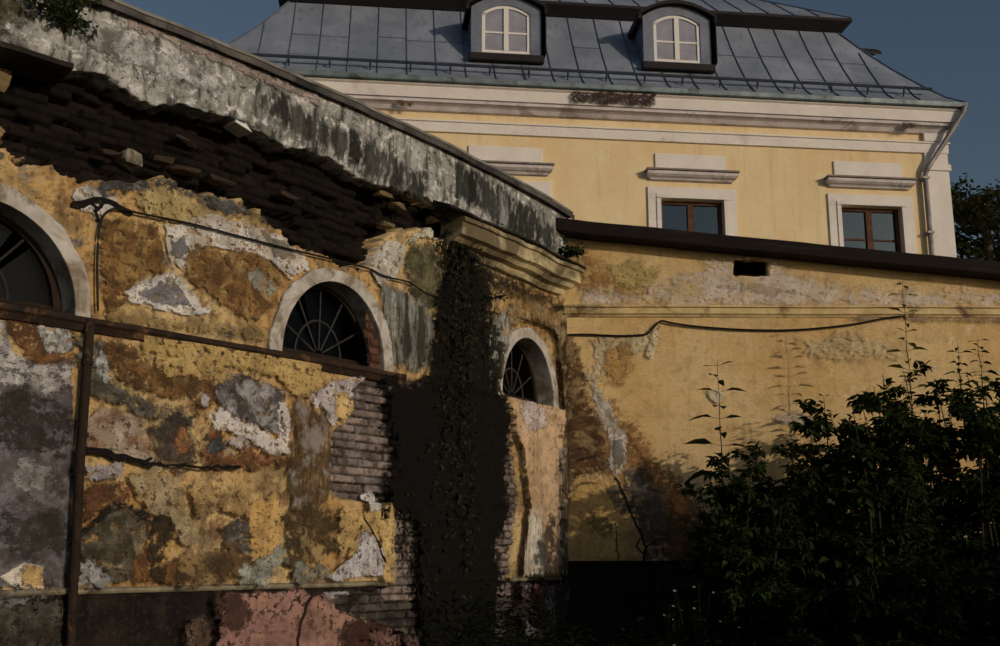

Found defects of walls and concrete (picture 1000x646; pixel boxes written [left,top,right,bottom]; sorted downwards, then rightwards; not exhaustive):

spalling [0,73,442,316]
damp [259,91,428,200]
damp [455,162,555,249]
peeling [488,310,513,395]
peeling [0,320,198,590]
crack [75,447,241,470]
spalling [185,373,427,646]
spalling [475,435,518,646]
peeling [520,401,547,433]
peeling [524,509,545,577]
damp [382,244,704,643]
crack [615,477,657,561]